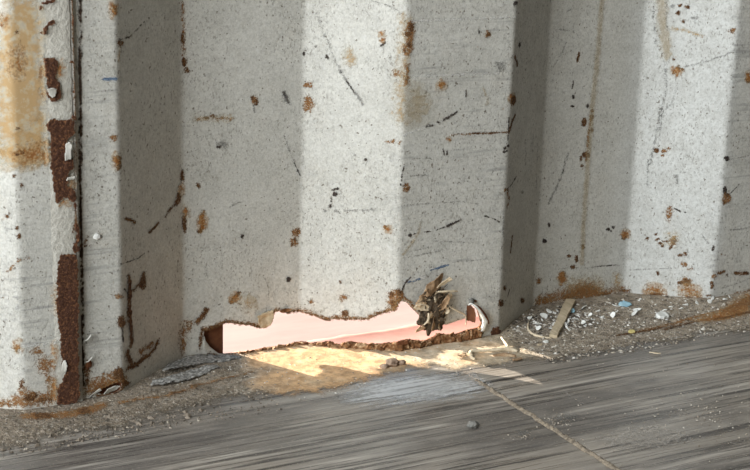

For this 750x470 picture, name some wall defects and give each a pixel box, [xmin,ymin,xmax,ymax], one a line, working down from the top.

corrosion [392,20,416,89]
corrosion [0,271,160,420]